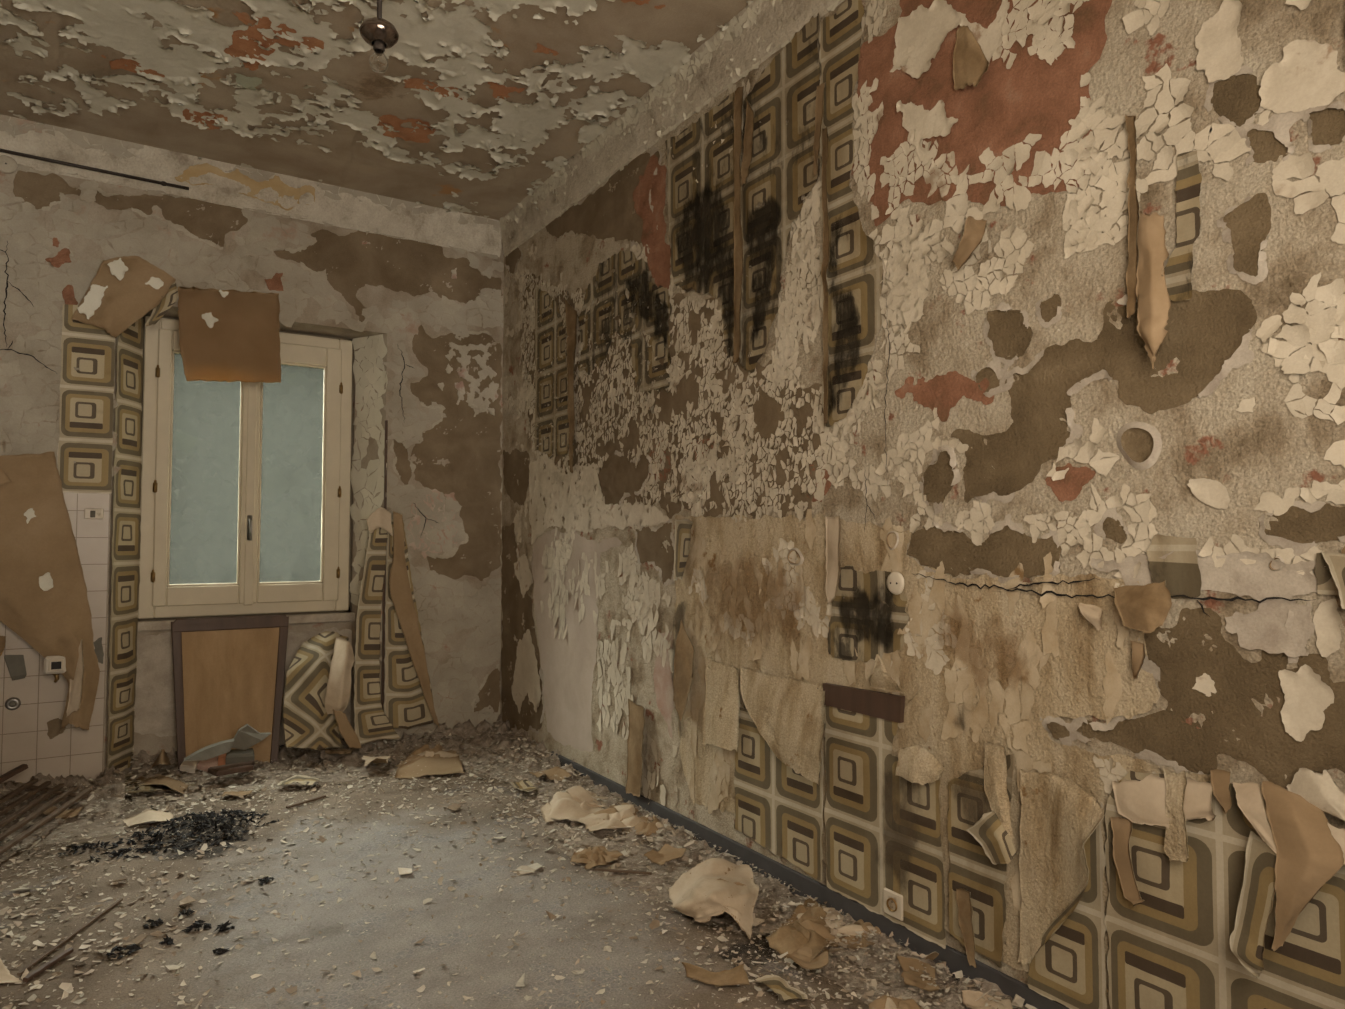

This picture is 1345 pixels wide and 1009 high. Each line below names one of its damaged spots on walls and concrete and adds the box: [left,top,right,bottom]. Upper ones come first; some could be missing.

crack [0,241,55,372]
mould [626,269,670,360]
mould [676,185,781,349]
mould [828,221,861,416]
mould [839,590,893,647]
crack [913,574,1115,598]
crack [1171,595,1316,617]